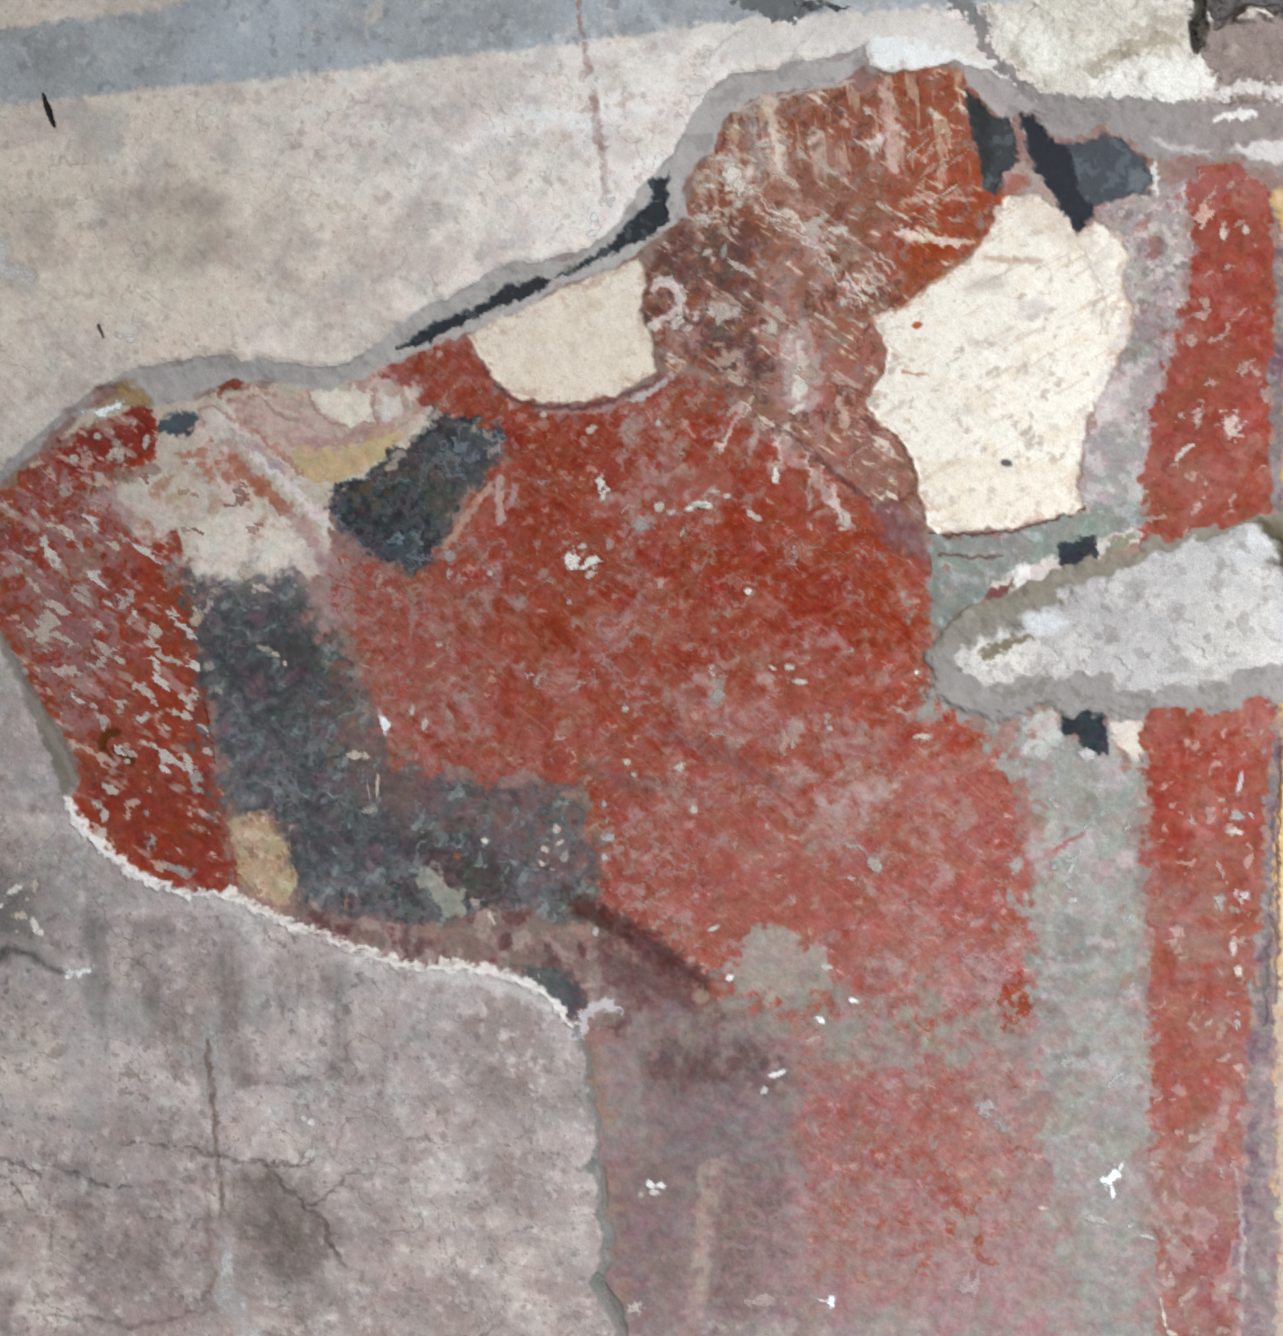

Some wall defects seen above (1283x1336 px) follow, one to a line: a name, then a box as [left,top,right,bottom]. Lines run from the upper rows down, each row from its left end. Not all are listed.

spalling [42,93,56,127]
peeling [1193,181,1249,240]
flaking render [469,260,693,417]
peeling [707,292,785,339]
flaking render [833,194,1135,535]
peeling [1220,410,1247,436]
peeling [654,489,730,515]
peeling [564,536,614,579]
peeling [14,499,214,794]
peeling [379,716,390,733]
spalling [62,784,582,1037]
crack [574,1025,627,1336]